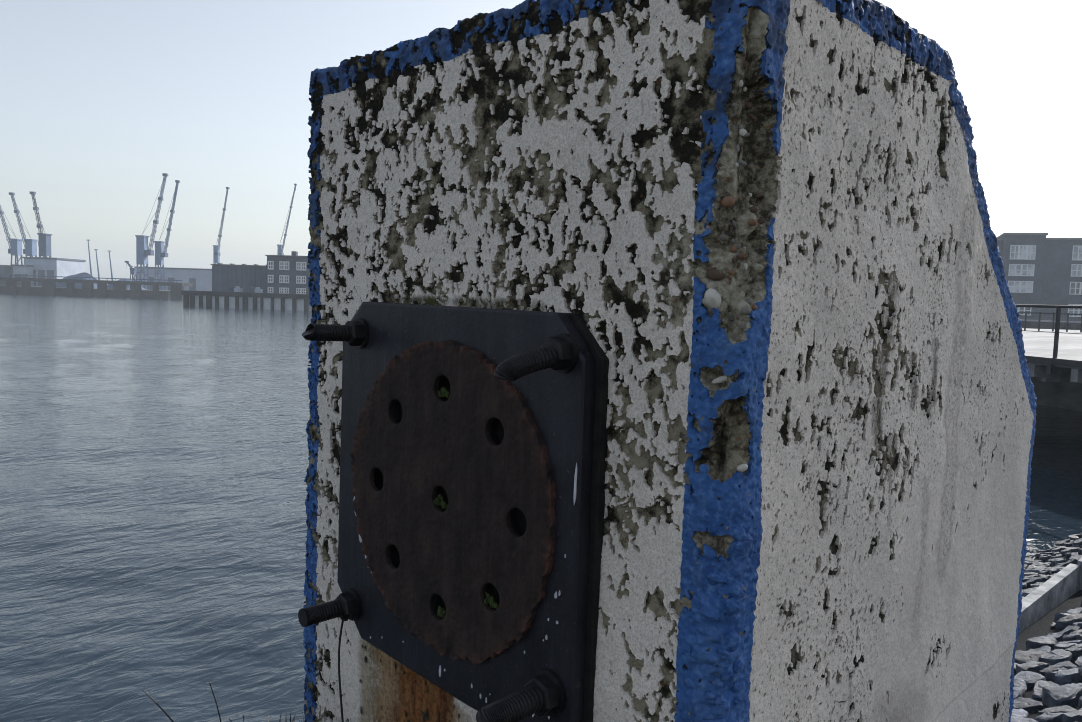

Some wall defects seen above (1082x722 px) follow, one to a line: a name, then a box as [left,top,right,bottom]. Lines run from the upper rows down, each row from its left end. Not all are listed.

peeling [306,0,779,599]
peeling [306,570,332,606]
peeling [305,623,350,722]
rust [360,640,460,722]
peeling [600,586,693,722]